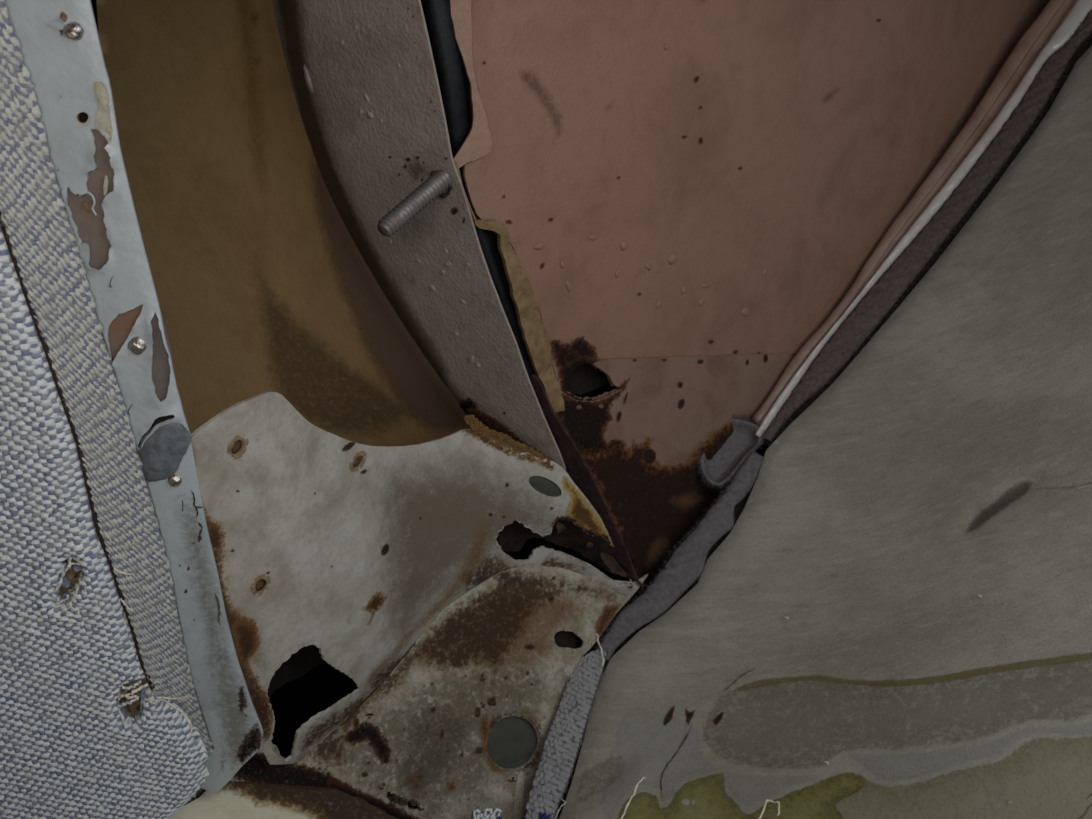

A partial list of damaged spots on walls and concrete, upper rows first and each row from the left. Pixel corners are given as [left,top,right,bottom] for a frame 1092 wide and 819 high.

peeling [67,129,115,270]
peeling [108,304,174,402]
rust [459,398,553,471]
rust [550,336,758,594]
rust [755,439,769,455]
rust [204,508,622,819]
water stain [739,653,1092,690]
crack [660,729,691,799]
water stain [604,710,1092,819]